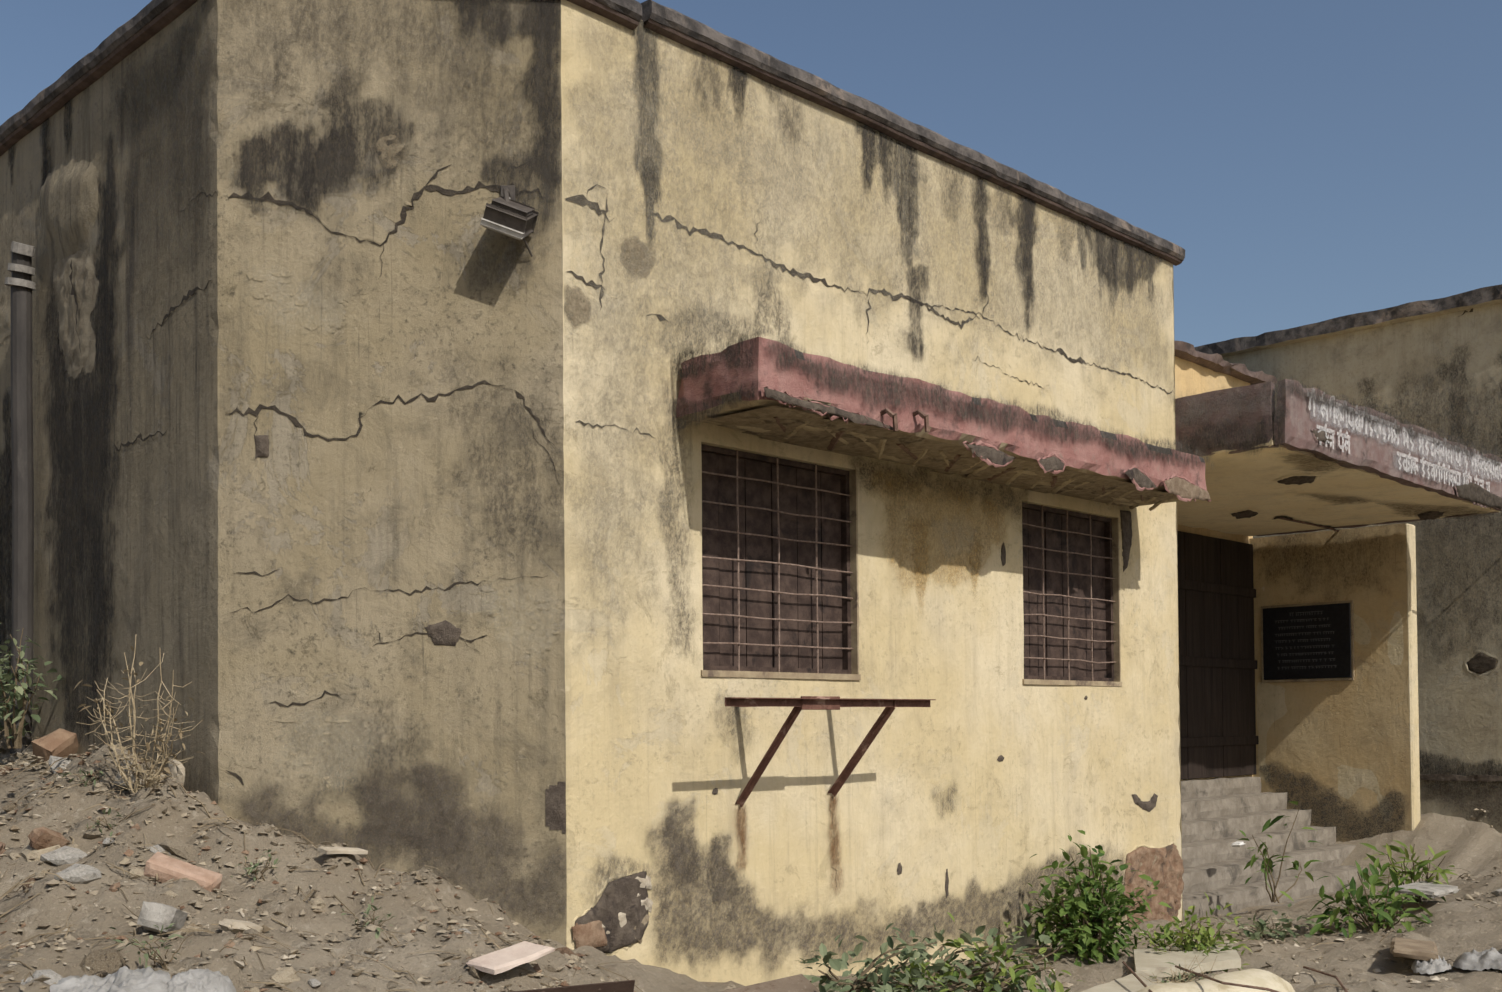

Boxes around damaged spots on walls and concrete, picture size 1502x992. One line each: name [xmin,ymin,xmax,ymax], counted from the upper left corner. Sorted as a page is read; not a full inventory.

flaking render [53,249,100,381]
leakage [40,0,211,774]
crack [146,277,213,339]
crack [225,374,656,483]
crack [177,160,1175,394]
leakage [856,122,928,358]
spalling [705,386,1211,573]
leakage [941,161,1036,320]
leakage [661,272,1502,654]
spalling [1228,509,1263,519]
spalling [571,868,653,956]
leakage [598,802,1128,969]